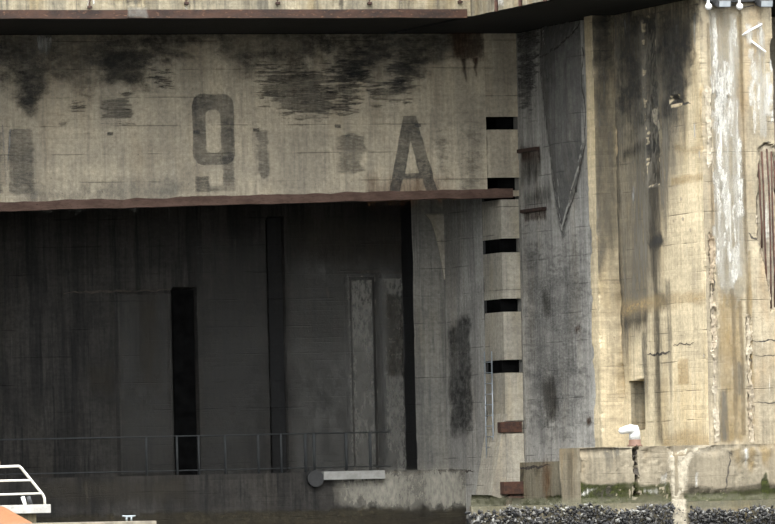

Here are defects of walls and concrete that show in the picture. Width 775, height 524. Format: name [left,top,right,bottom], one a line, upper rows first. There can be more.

damp [746,23,774,128]
damp [708,19,744,303]
spalling [755,146,775,309]
spalling [703,233,720,442]
spalling [746,314,755,443]
crack [632,445,640,486]